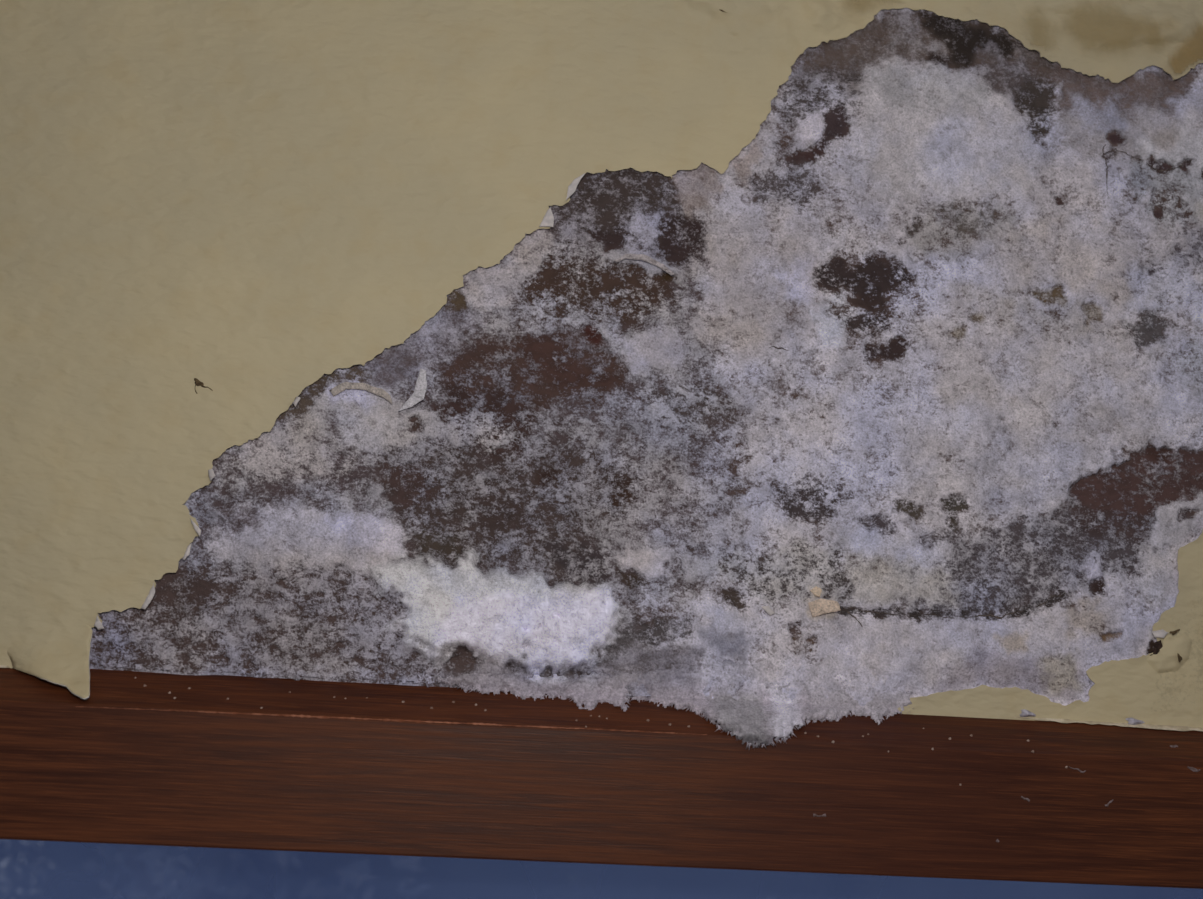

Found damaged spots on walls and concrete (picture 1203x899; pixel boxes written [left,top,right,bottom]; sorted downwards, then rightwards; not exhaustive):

peeling [752,83,851,206]
peeling [1102,131,1127,163]
peeling [1136,154,1203,178]
peeling [816,223,920,361]
peeling [276,245,692,584]
leakage [89,8,1203,749]
peeling [200,448,295,514]
peeling [782,485,839,522]
peeling [867,447,1203,622]
peeling [7,516,285,700]
peeling [279,576,347,661]
peeling [300,645,477,688]